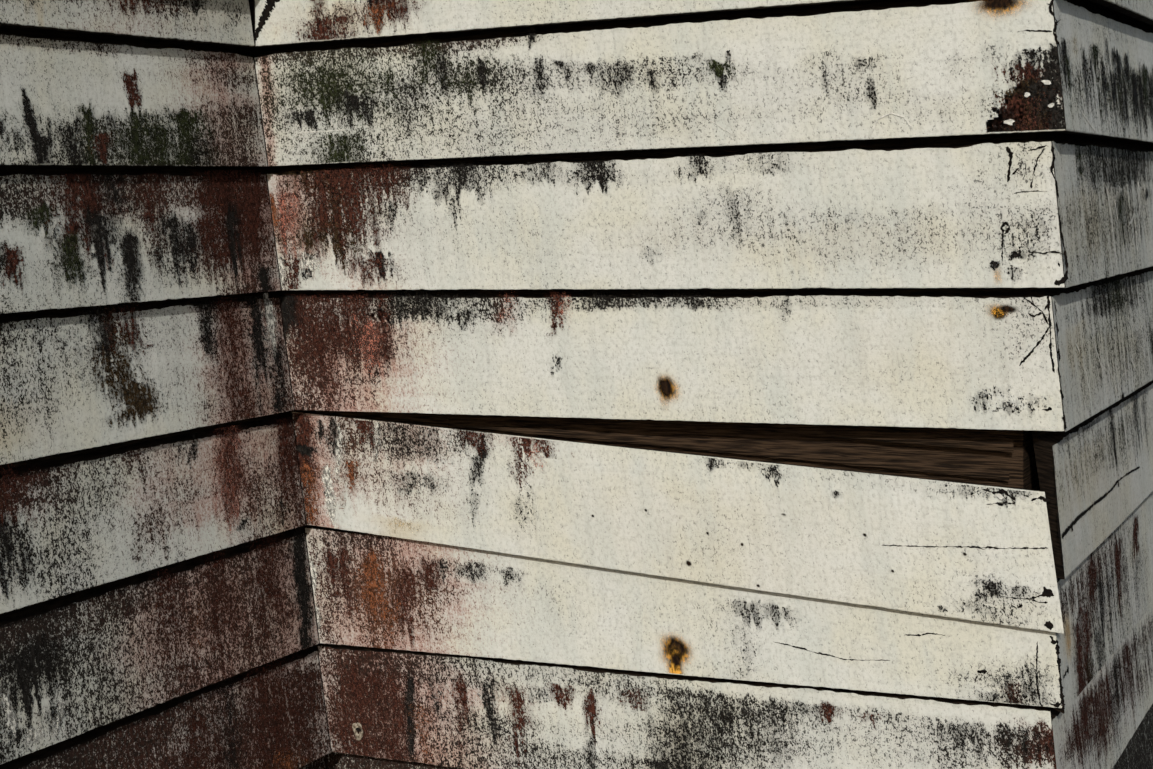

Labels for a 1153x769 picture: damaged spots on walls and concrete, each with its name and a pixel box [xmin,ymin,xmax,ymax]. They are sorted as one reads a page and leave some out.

corrosion [293,0,427,40]
water stain [528,27,662,99]
water stain [684,50,739,92]
water stain [1059,38,1153,251]
corrosion [992,305,1016,319]
crack [1006,145,1069,430]
water stain [0,34,552,769]
corrosion [659,379,676,398]
crack [883,456,1140,608]
corrosion [664,638,689,674]
crack [1035,636,1066,709]
water stain [617,689,843,769]